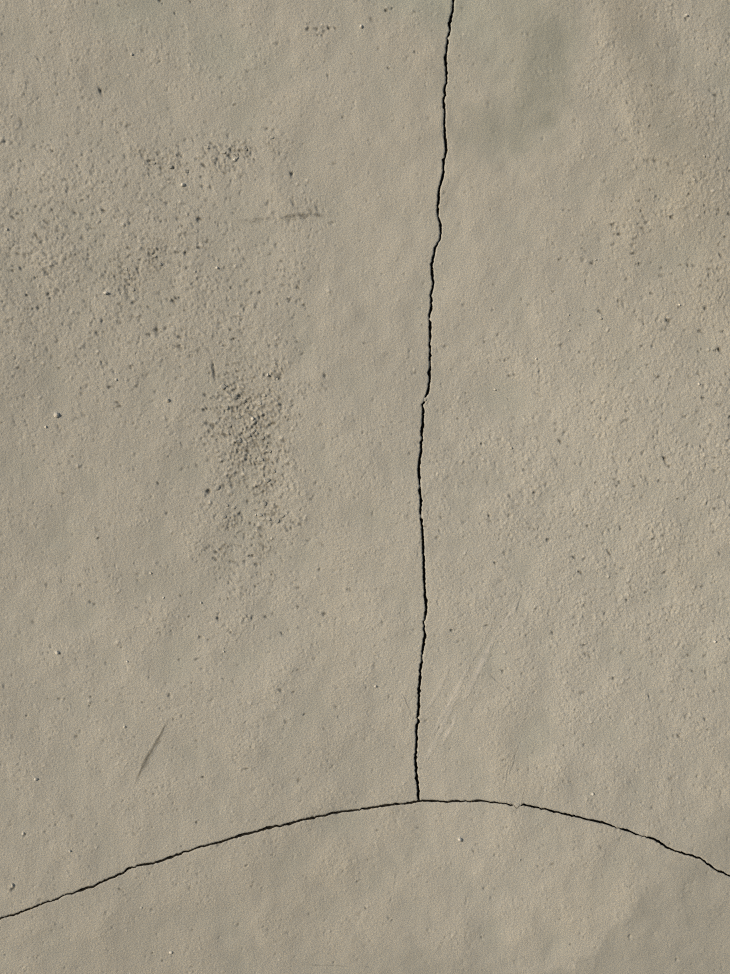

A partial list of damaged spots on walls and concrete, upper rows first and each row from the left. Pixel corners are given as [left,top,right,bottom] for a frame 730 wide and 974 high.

crack [417,0,455,515]
crack [0,518,730,920]